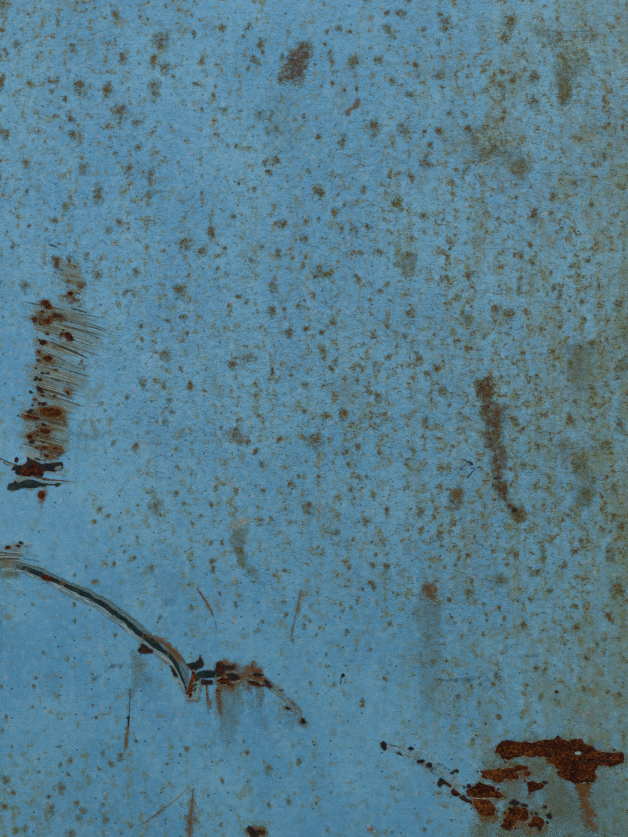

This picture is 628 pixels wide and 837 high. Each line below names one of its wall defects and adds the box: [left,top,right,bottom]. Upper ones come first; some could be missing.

rust [22,380,72,460]
spalling [0,541,307,727]
rust [206,685,222,715]
rust [185,789,195,836]
rust [245,826,267,837]
rust [453,736,626,837]